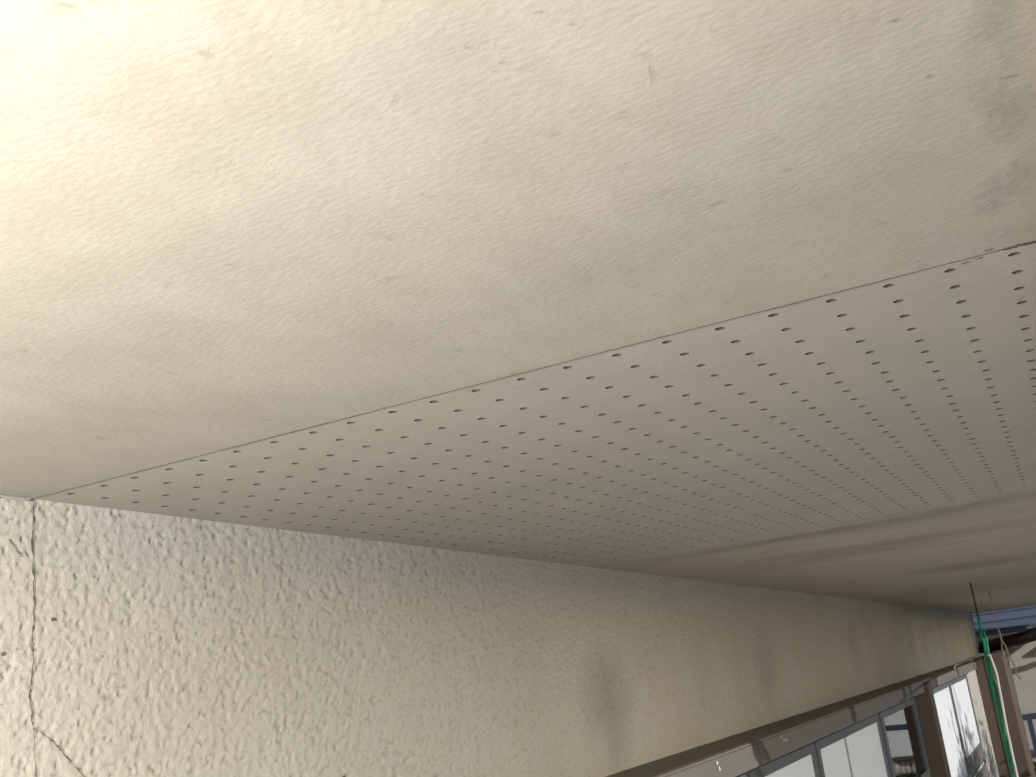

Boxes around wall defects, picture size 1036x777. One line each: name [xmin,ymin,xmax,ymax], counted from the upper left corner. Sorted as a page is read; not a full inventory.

crack [29,499,85,777]